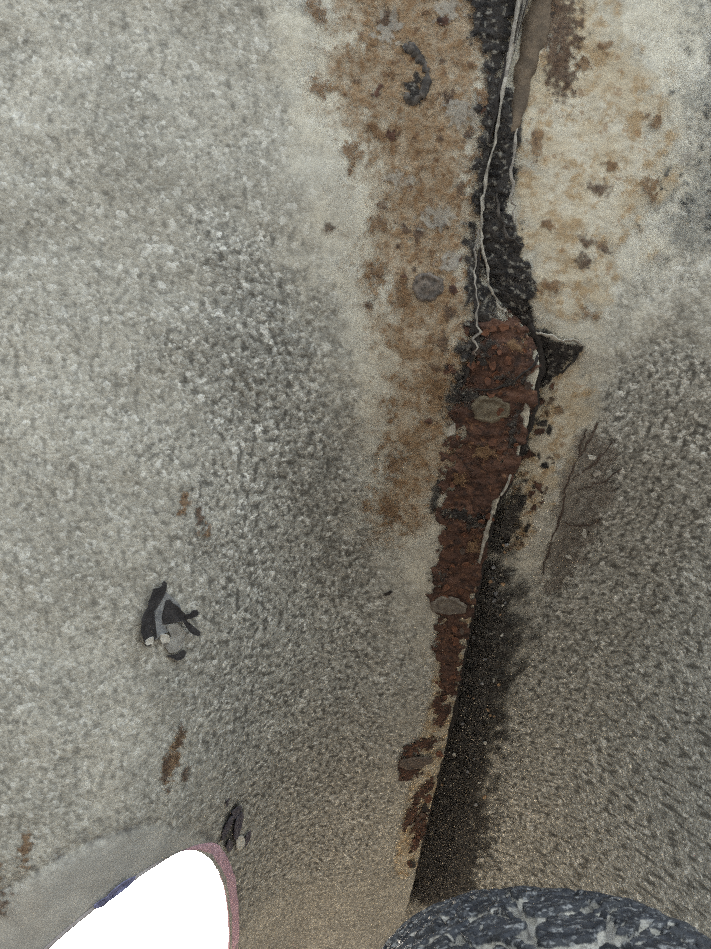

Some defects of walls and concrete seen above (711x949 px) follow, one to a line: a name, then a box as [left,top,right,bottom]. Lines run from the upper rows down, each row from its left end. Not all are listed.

water stain [440,0,552,419]
crack [487,41,510,142]
corrosion [515,0,680,322]
peeling [141,581,201,661]
corrosion [305,0,599,880]
water stain [409,468,538,907]
crack [416,248,546,872]